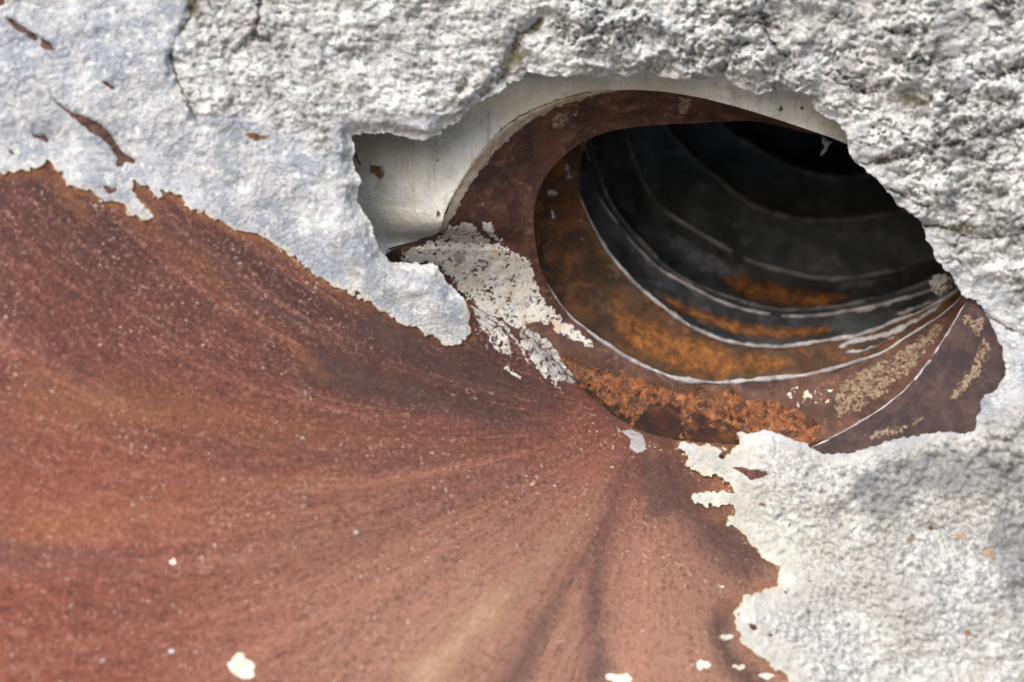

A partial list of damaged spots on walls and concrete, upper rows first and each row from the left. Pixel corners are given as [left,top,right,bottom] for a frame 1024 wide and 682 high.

spalling [8,19,55,50]
spalling [53,98,135,167]
corrosion [493,91,592,138]
peeling [400,221,593,390]
corrosion [664,296,829,339]
corrosion [720,275,845,307]
corrosion [614,314,790,375]
corrosion [560,351,822,447]
peeling [620,428,647,453]
spalling [732,467,768,480]
peeling [227,653,255,679]
peeling [606,673,632,682]